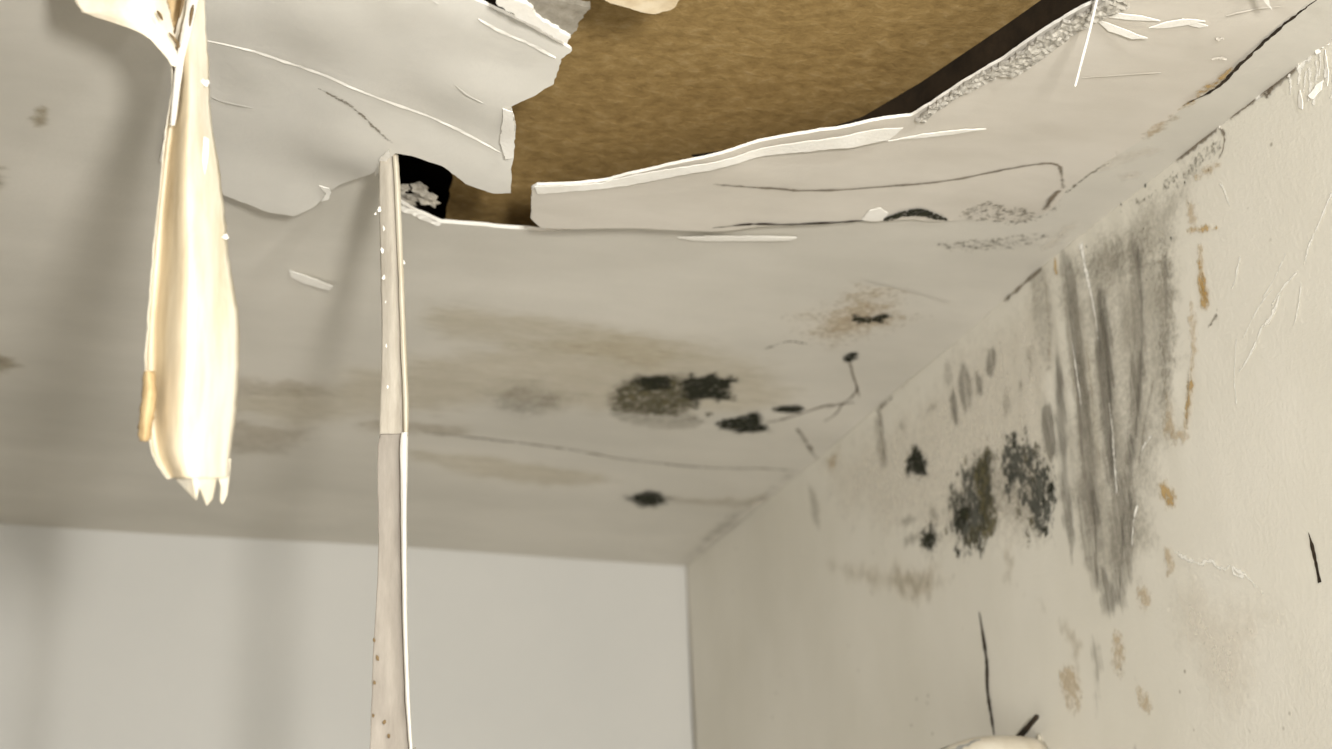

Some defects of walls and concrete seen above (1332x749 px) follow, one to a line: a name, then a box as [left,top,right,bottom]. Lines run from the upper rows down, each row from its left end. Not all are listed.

crack [1179,0,1317,159]
peeling [1288,43,1332,109]
spalling [678,208,947,241]
crack [1007,269,1041,299]
water stain [1079,243,1099,338]
mould [613,371,842,434]
water stain [1108,403,1117,492]
mould [624,490,671,508]
mould [920,427,1057,558]